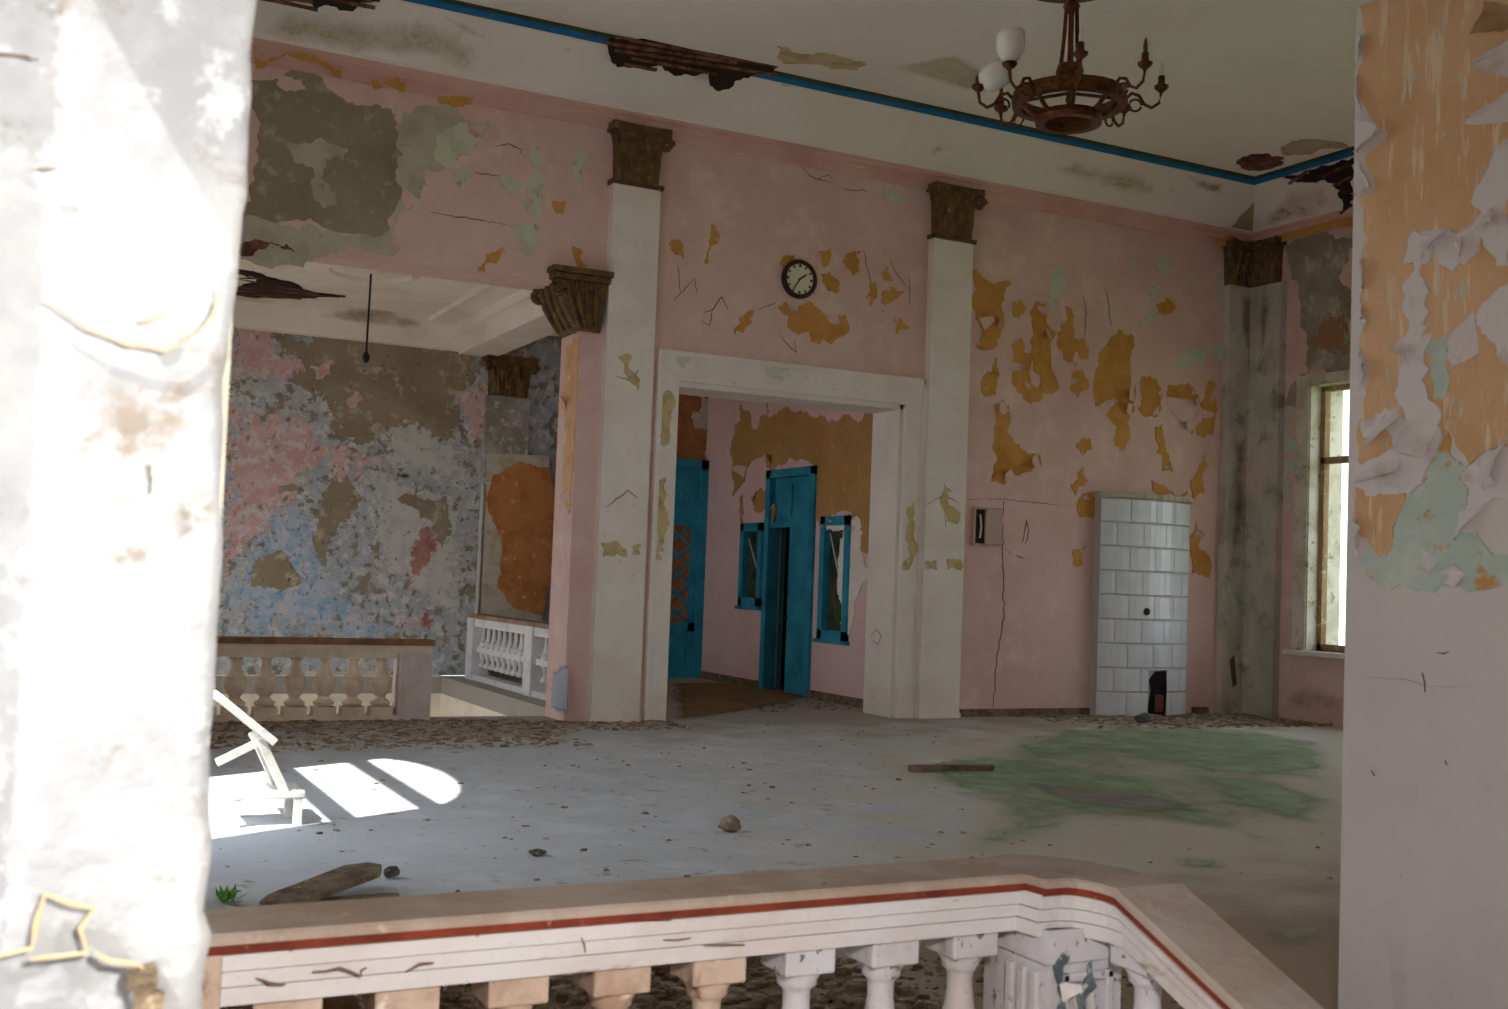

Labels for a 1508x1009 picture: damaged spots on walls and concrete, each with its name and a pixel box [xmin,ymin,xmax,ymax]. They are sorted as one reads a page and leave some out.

spalling [261,0,380,12]
spalling [605,35,867,91]
spalling [236,52,490,300]
spalling [220,328,488,630]
peeling [601,478,670,560]
peeling [728,399,873,635]
peeling [778,301,849,345]
peeling [819,249,909,334]
crack [926,484,1066,707]
peeling [972,269,1218,501]
peeling [1215,0,1508,592]
spalling [125,961,167,1009]